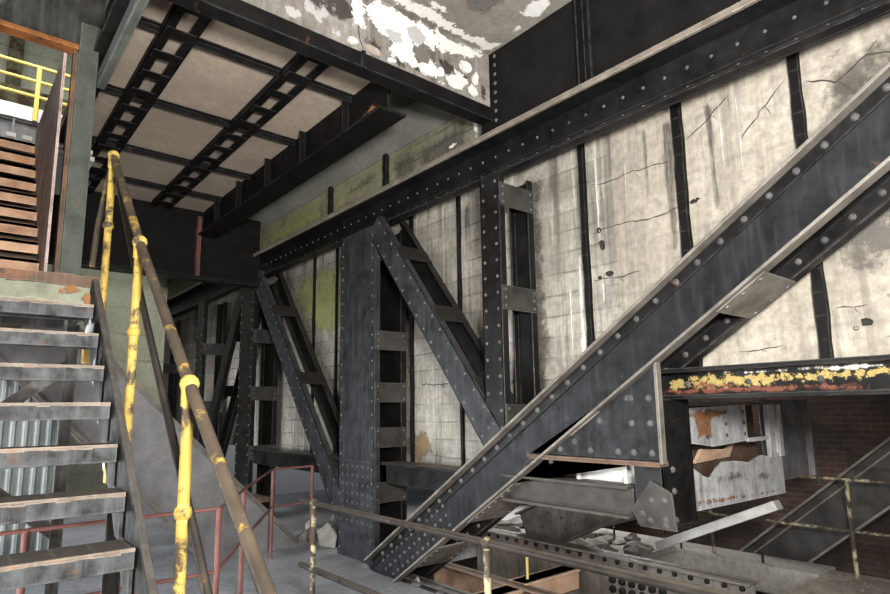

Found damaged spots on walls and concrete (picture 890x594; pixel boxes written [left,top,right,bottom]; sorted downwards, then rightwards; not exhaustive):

peeling [519,0,550,18]
peeling [285,0,483,97]
crack [807,41,890,84]
crack [741,78,786,139]
leakage [839,208,890,270]
rust [665,366,890,394]
rust [689,410,725,438]